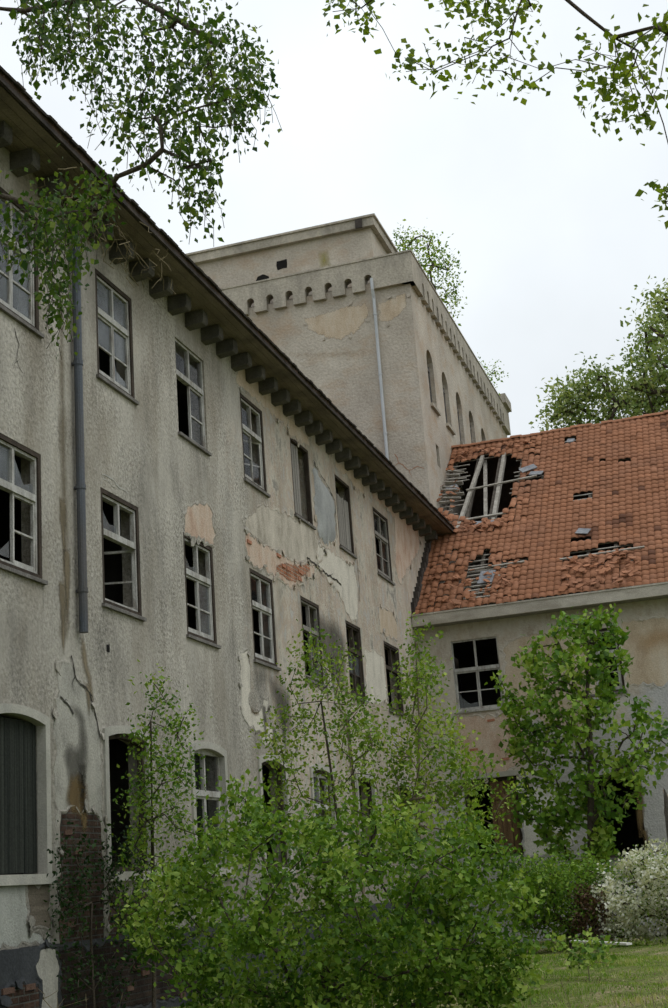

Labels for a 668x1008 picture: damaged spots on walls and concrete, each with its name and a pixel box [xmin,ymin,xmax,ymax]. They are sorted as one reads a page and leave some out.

spalling [183,500,217,548]
spalling [241,502,358,623]
crack [307,554,361,601]
crack [60,655,101,737]
spalling [238,647,273,751]
spalling [453,630,599,783]
spalling [614,614,668,690]
spalling [0,660,200,1008]